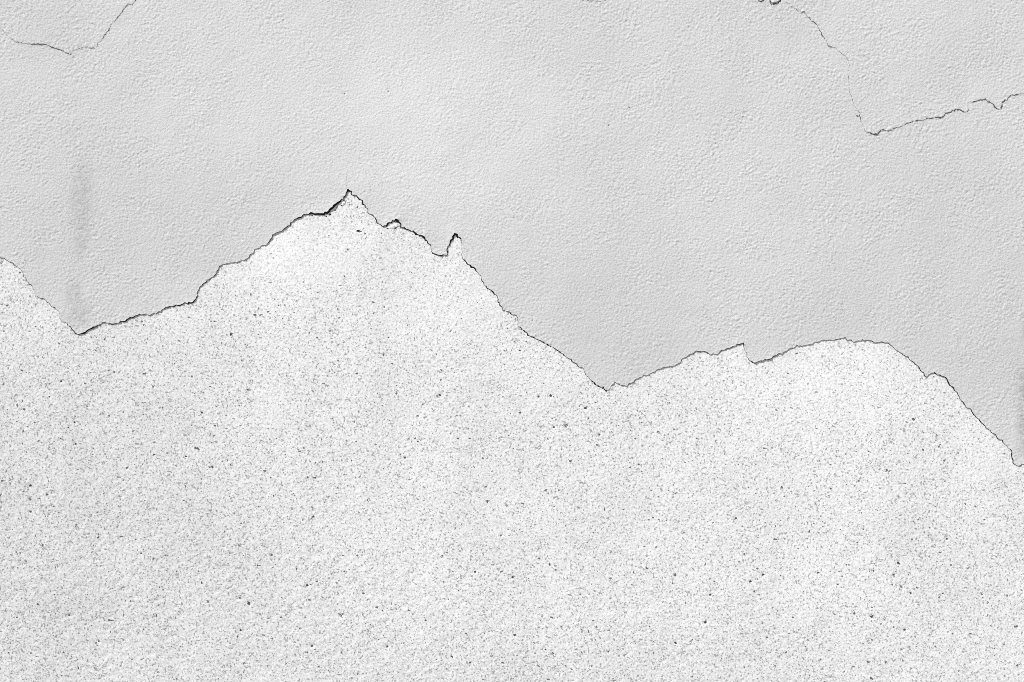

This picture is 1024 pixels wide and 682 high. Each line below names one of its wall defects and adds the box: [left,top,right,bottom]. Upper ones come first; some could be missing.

crack [786,2,1023,135]
peeling [0,189,1024,682]